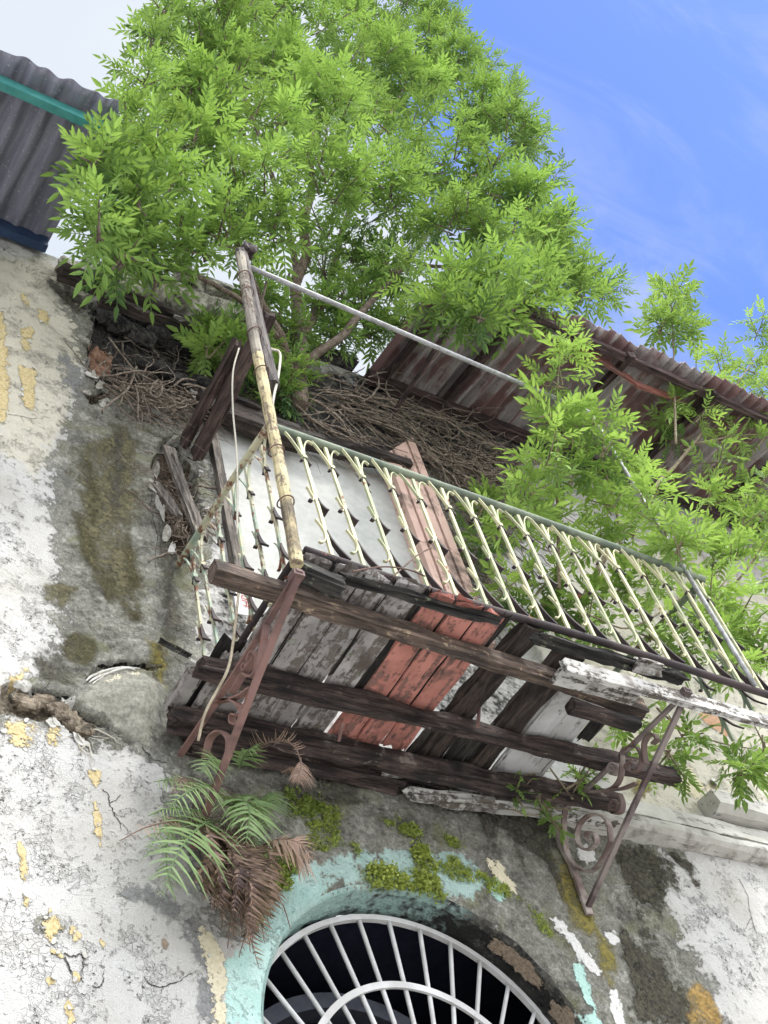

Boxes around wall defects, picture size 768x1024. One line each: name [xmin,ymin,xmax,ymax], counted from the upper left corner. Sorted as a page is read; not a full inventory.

peeling [0,293,50,423]
leakage [70,414,148,620]
spalling [0,663,97,747]
peeling [85,666,160,684]
crack [102,789,129,833]
peeling [17,840,30,908]
peeling [485,858,518,902]
peeling [576,844,598,865]
peeling [41,907,88,959]
peeling [197,925,228,1024]
spalling [487,917,626,1024]
leakage [615,844,700,1024]